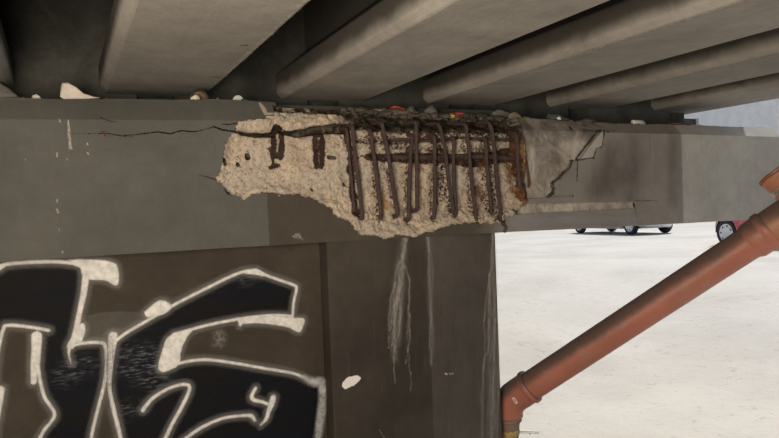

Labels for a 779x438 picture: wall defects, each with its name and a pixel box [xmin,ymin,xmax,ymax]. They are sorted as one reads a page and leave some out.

crack [78,117,237,137]
spalling [216,102,637,239]
corrosion [339,122,528,226]
crack [546,130,609,198]